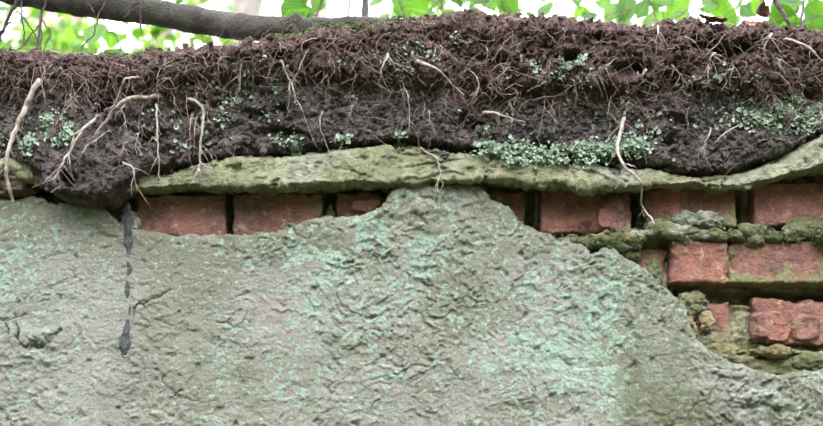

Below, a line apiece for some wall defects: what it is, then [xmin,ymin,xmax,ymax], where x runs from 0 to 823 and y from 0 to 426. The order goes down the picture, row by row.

peeling [0,177,66,205]
peeling [121,198,142,229]
peeling [306,188,390,218]
peeling [480,185,539,231]
peeling [778,175,823,184]
damp [118,203,134,355]
peeling [555,190,823,375]